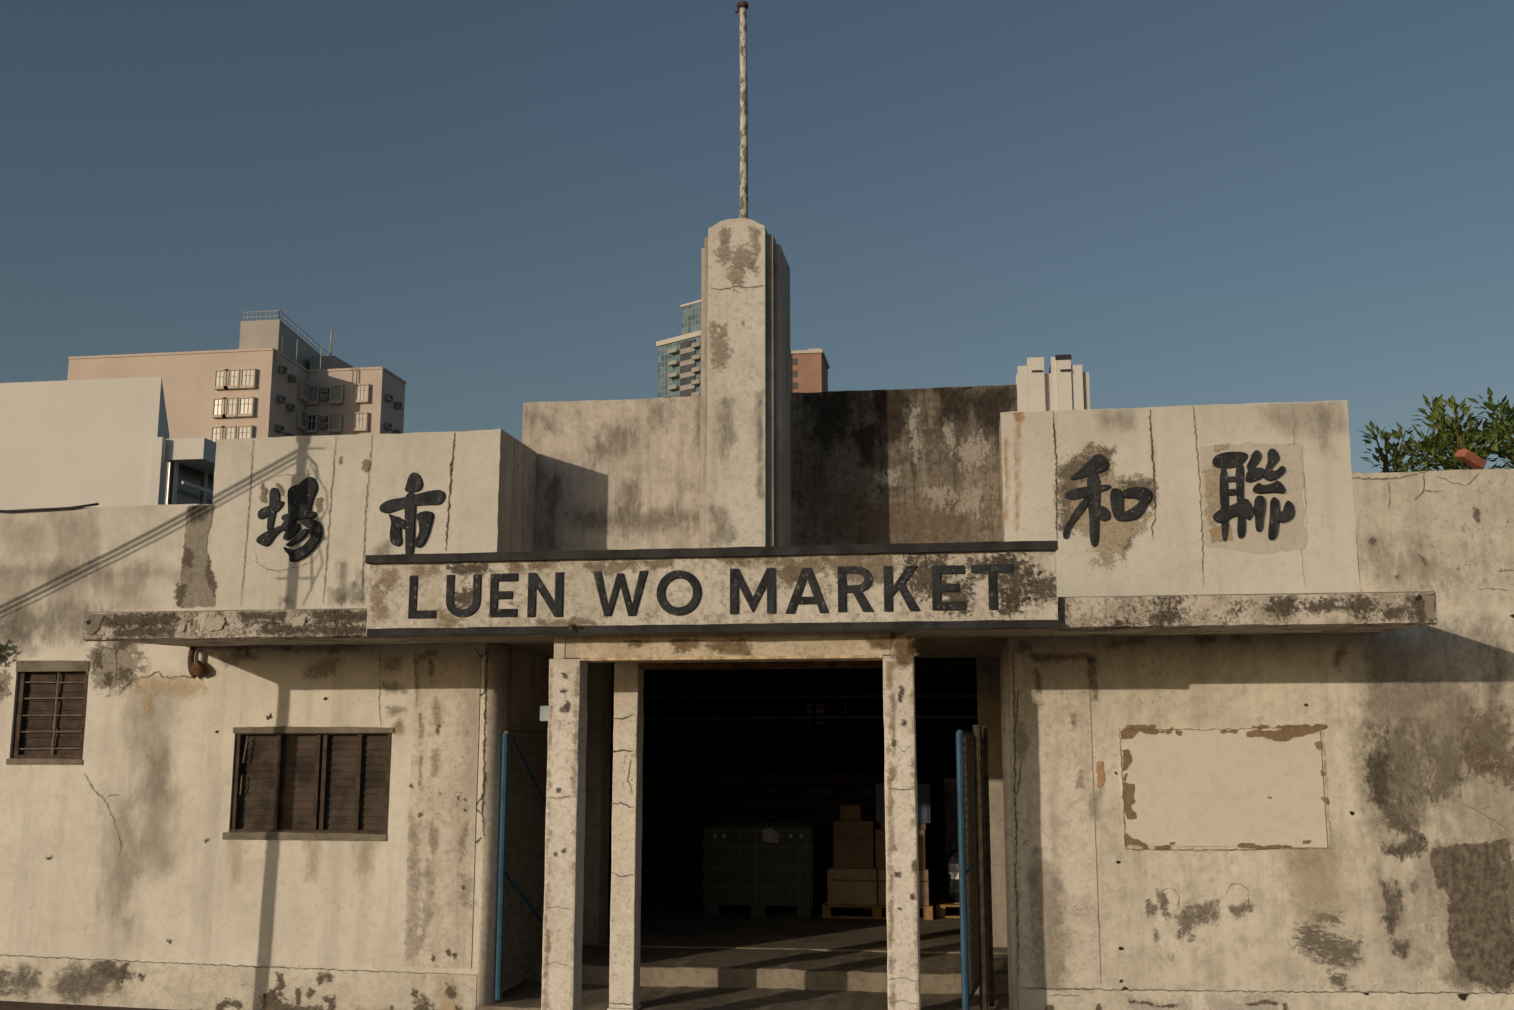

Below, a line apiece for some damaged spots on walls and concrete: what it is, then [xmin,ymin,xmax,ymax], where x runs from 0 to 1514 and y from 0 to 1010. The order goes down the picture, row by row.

leakage [803,390,925,489]
leakage [921,386,1014,521]
peeling [1053,442,1159,569]
peeling [292,616,306,627]
crack [84,773,122,856]
peeling [1096,724,1182,864]
peeling [1220,704,1327,750]
peeling [1237,840,1311,849]
leakage [1364,655,1514,859]
leakage [1382,878,1419,959]
spalling [190,997,242,1010]
spalling [258,971,336,1010]